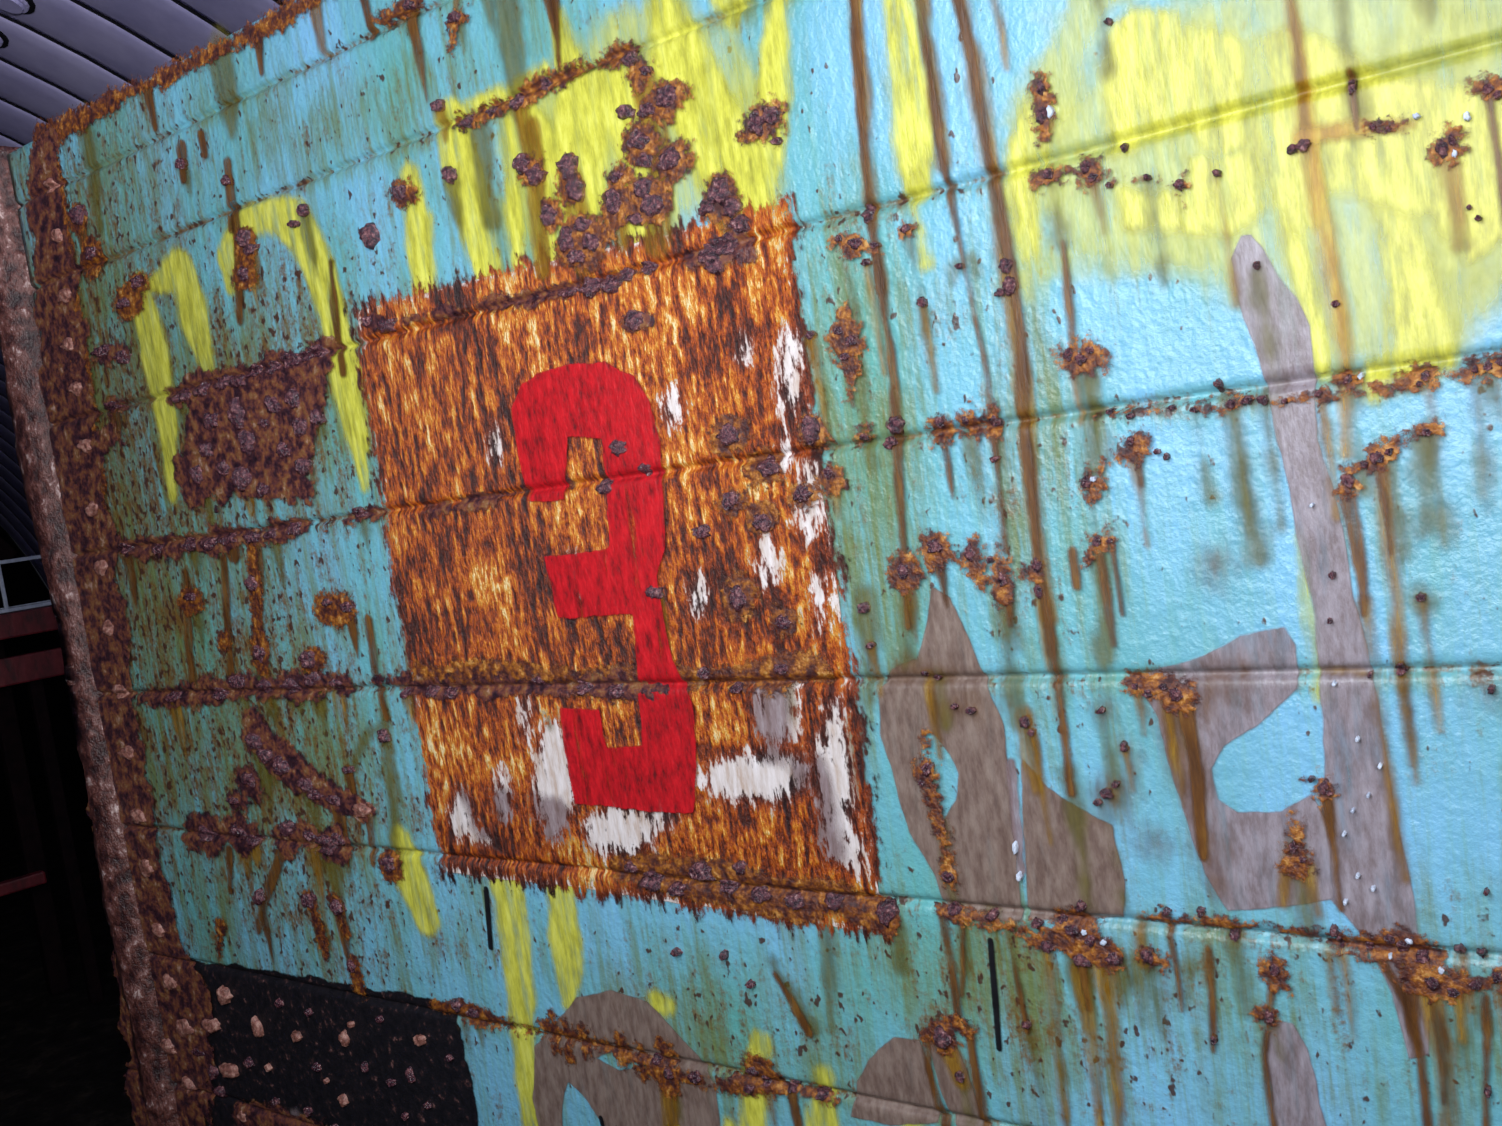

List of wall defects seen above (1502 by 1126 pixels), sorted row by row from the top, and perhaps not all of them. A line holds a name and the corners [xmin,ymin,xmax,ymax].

rust [24,0,1131,1126]
rust [910,668,1502,1126]
rust [1024,0,1502,776]